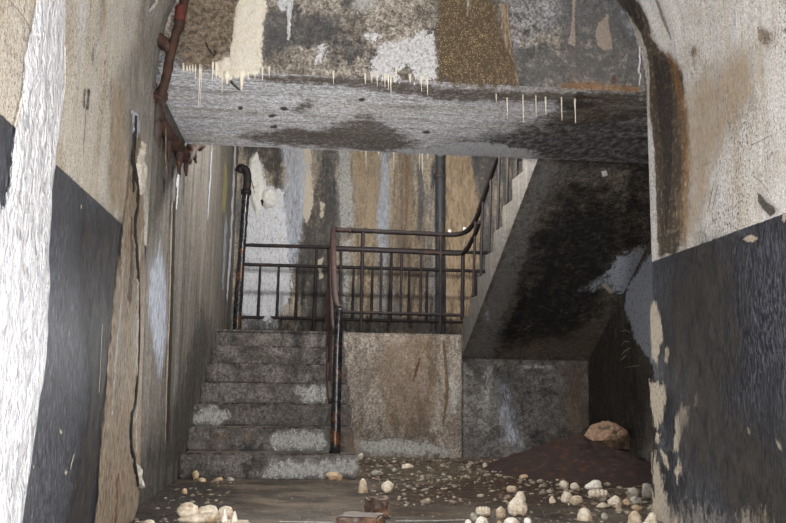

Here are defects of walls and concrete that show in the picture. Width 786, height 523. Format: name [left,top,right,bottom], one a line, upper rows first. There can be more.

spalling [568,0,577,46]
spalling [593,14,614,52]
corrosion [667,53,690,244]
crack [129,115,148,490]
damp [214,0,786,523]
peeling [590,244,724,523]
peeling [735,504,775,523]